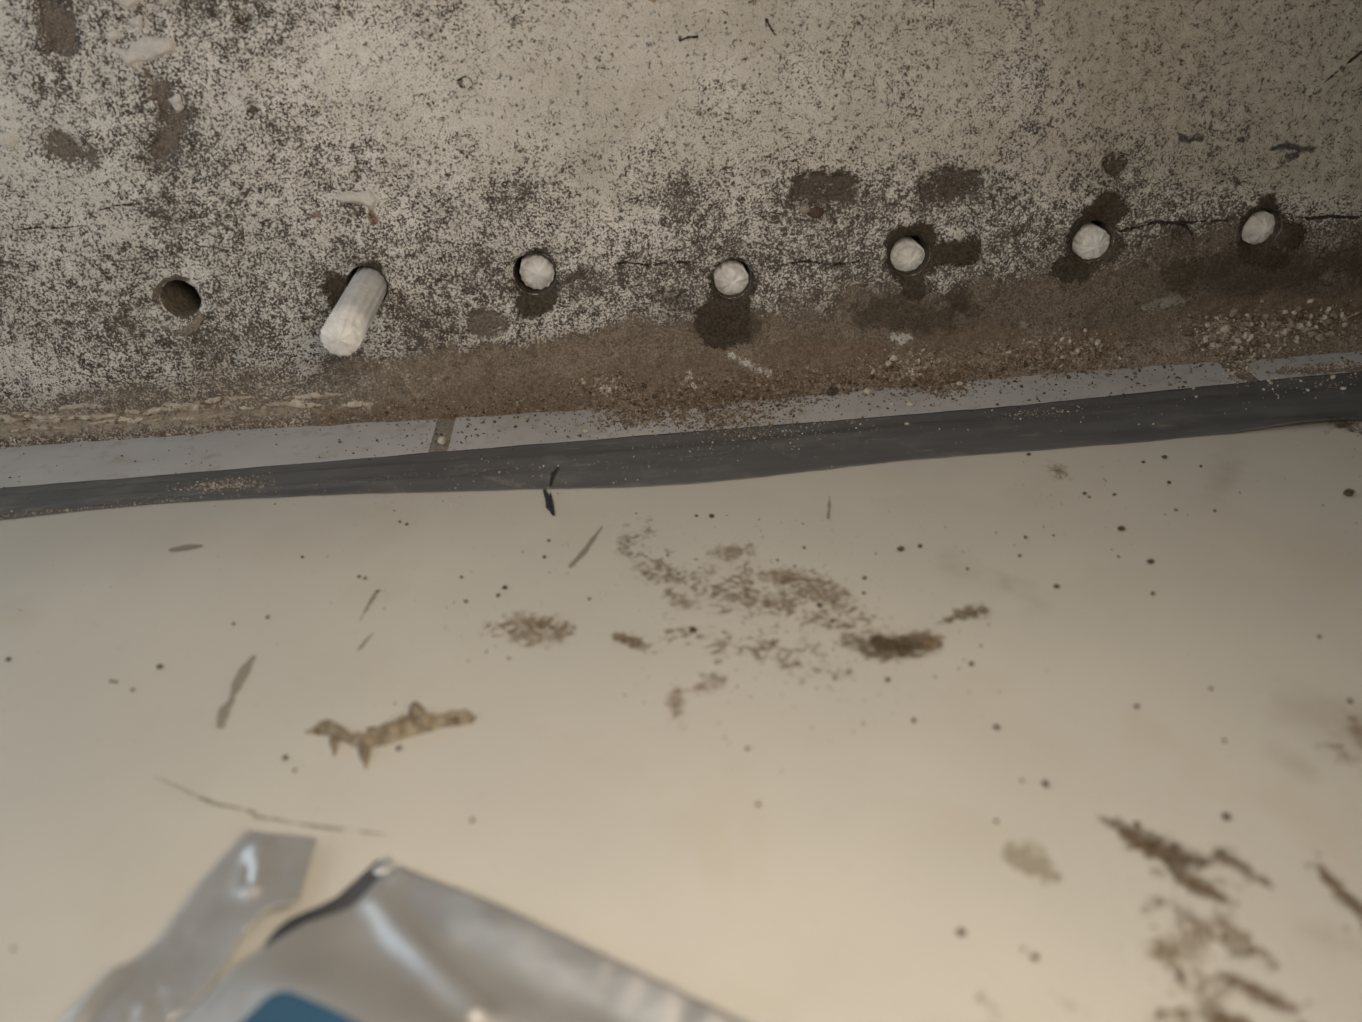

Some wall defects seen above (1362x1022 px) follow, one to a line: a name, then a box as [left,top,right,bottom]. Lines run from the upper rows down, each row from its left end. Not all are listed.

leakage [635,222,1031,393]
leakage [1050,191,1129,283]
crack [1119,219,1229,241]
leakage [1078,194,1362,343]
crack [1285,212,1360,220]
leakage [316,365,622,422]